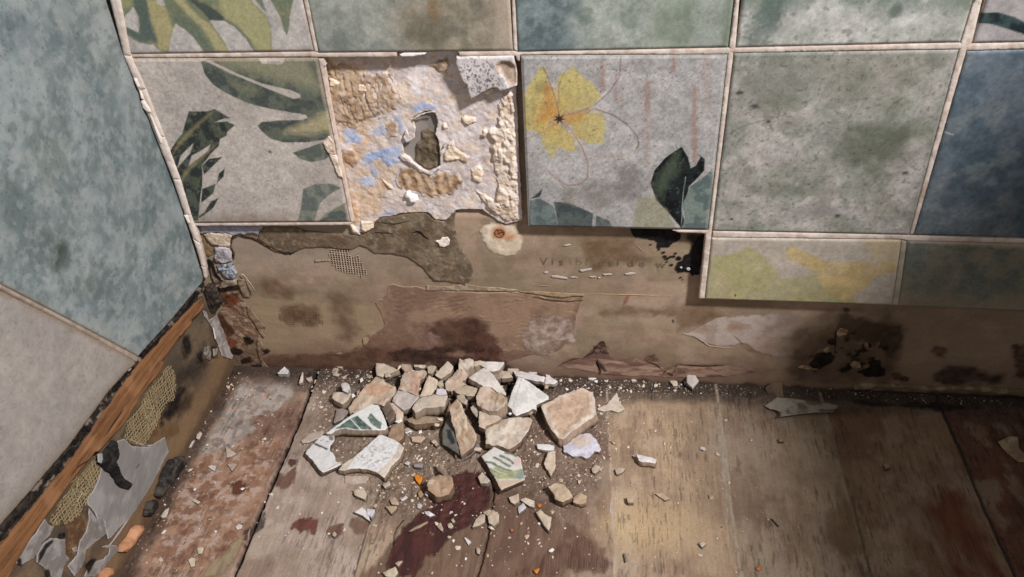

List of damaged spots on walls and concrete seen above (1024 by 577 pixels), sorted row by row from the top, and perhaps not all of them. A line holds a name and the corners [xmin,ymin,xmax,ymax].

spalling [184,51,583,363]
damp [585,228,705,280]
damp [265,314,576,372]
peeling [683,314,791,357]
damp [793,308,908,381]
damp [935,366,1002,384]
flaking render [16,437,169,577]
peeling [188,547,205,569]